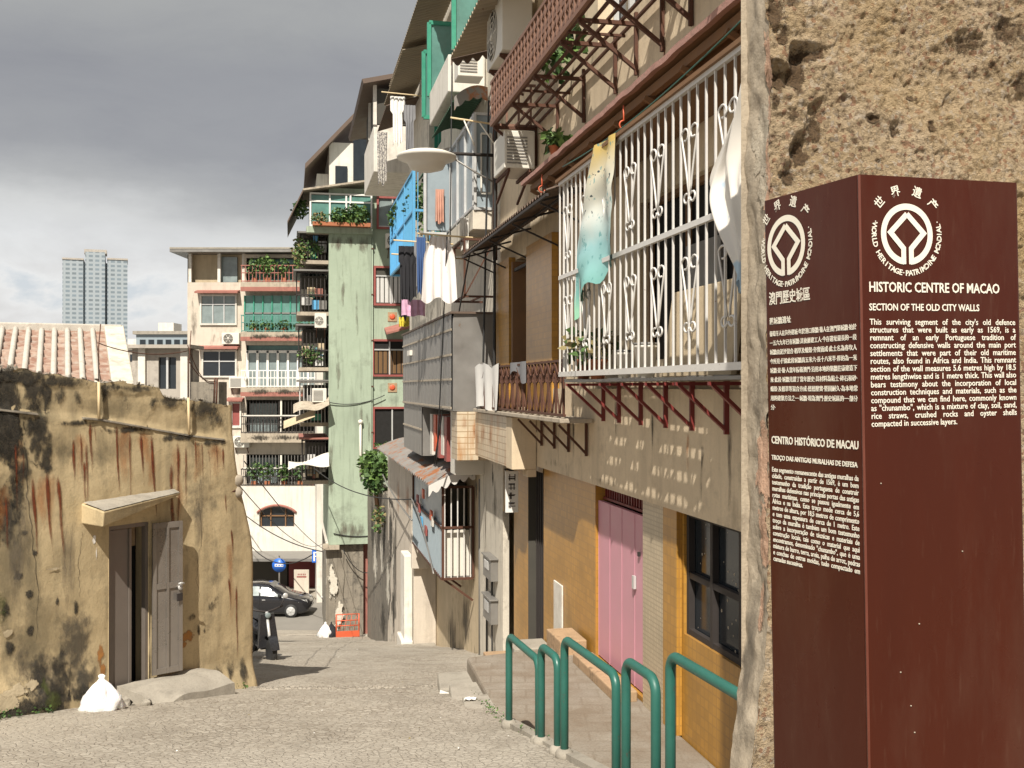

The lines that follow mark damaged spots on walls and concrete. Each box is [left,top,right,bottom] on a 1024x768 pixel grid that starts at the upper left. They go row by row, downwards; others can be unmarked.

leakage [0,366,82,580]
rust [32,476,64,548]
rust [72,425,92,497]
rust [116,430,155,491]
rust [170,442,203,521]
peeling [328,564,344,630]
leakage [0,651,89,718]